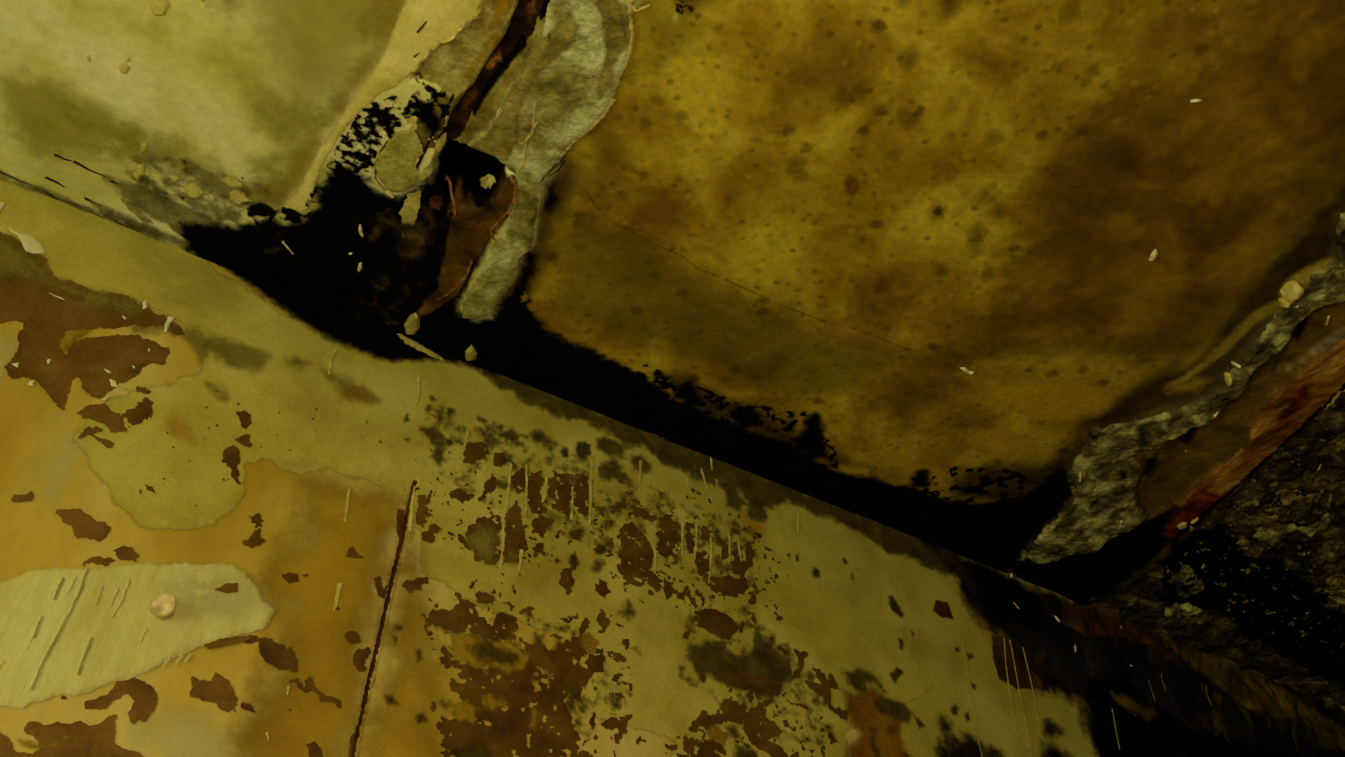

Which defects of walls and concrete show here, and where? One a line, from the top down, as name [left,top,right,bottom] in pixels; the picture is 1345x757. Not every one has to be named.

spalling [281,0,650,319]
leakage [971,0,1345,362]
peeling [0,180,1100,757]
leakage [894,400,913,425]
leakage [909,355,975,388]
leakage [981,428,1037,462]
leakage [987,380,1110,421]
leakage [1059,311,1276,471]
leakage [1136,301,1345,521]
rust [1161,339,1345,538]
leakage [682,608,849,721]
leakage [935,641,1002,757]